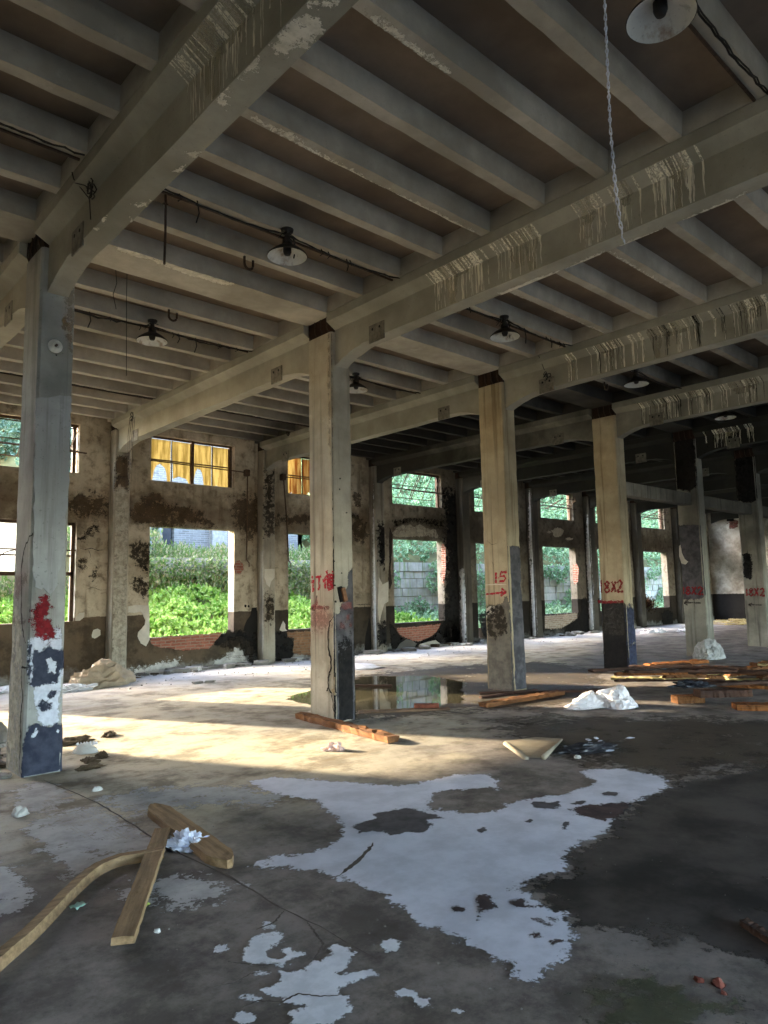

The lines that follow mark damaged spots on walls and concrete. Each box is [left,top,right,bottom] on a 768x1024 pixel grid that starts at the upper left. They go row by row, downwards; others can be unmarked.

peeling [214,0,340,112]
efflorescence [571,145,706,247]
efflorescence [425,224,542,311]
efflorescence [587,294,768,374]
water stain [68,454,131,542]
water stain [129,492,218,530]
water stain [129,540,152,599]
flaking render [128,605,222,651]
peeling [364,524,446,650]
peeling [6,606,63,778]
crack [19,533,376,959]
crack [216,961,341,1008]